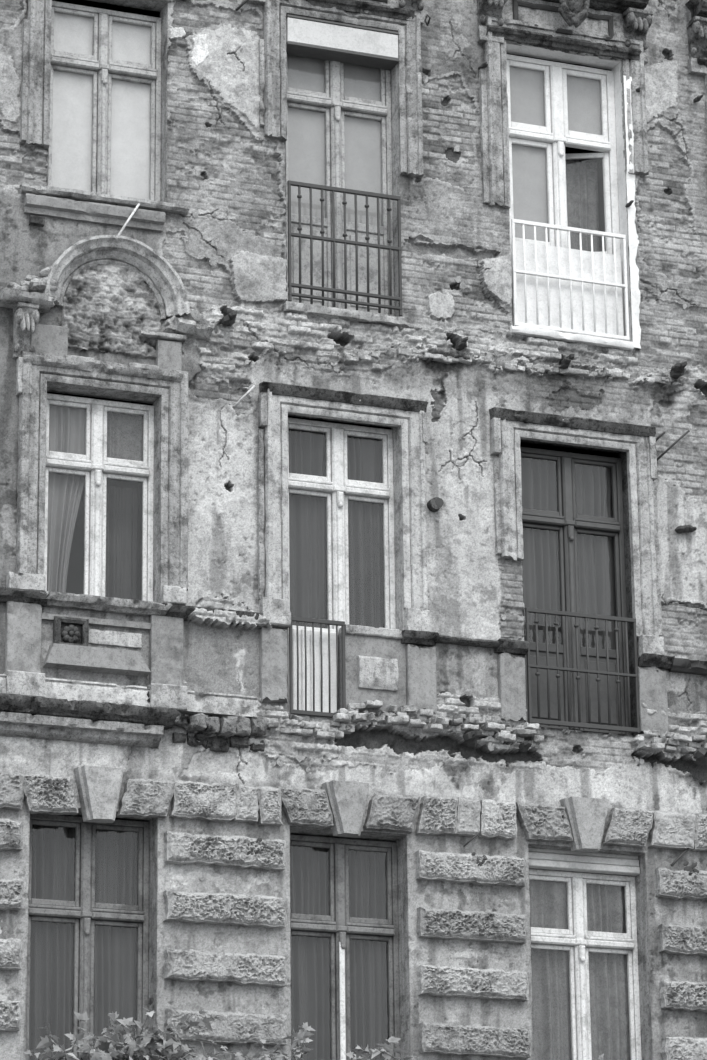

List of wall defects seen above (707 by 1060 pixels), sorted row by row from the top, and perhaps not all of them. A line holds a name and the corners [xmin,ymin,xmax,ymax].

crack [227,45,245,71]
spalling [0,43,48,187]
crack [209,81,226,131]
crack [657,114,688,160]
crack [181,209,234,261]
spalling [162,0,707,504]
spalling [7,264,161,359]
crack [438,401,488,480]
spalling [498,555,525,640]
spalling [661,600,707,661]
spalling [179,692,707,785]